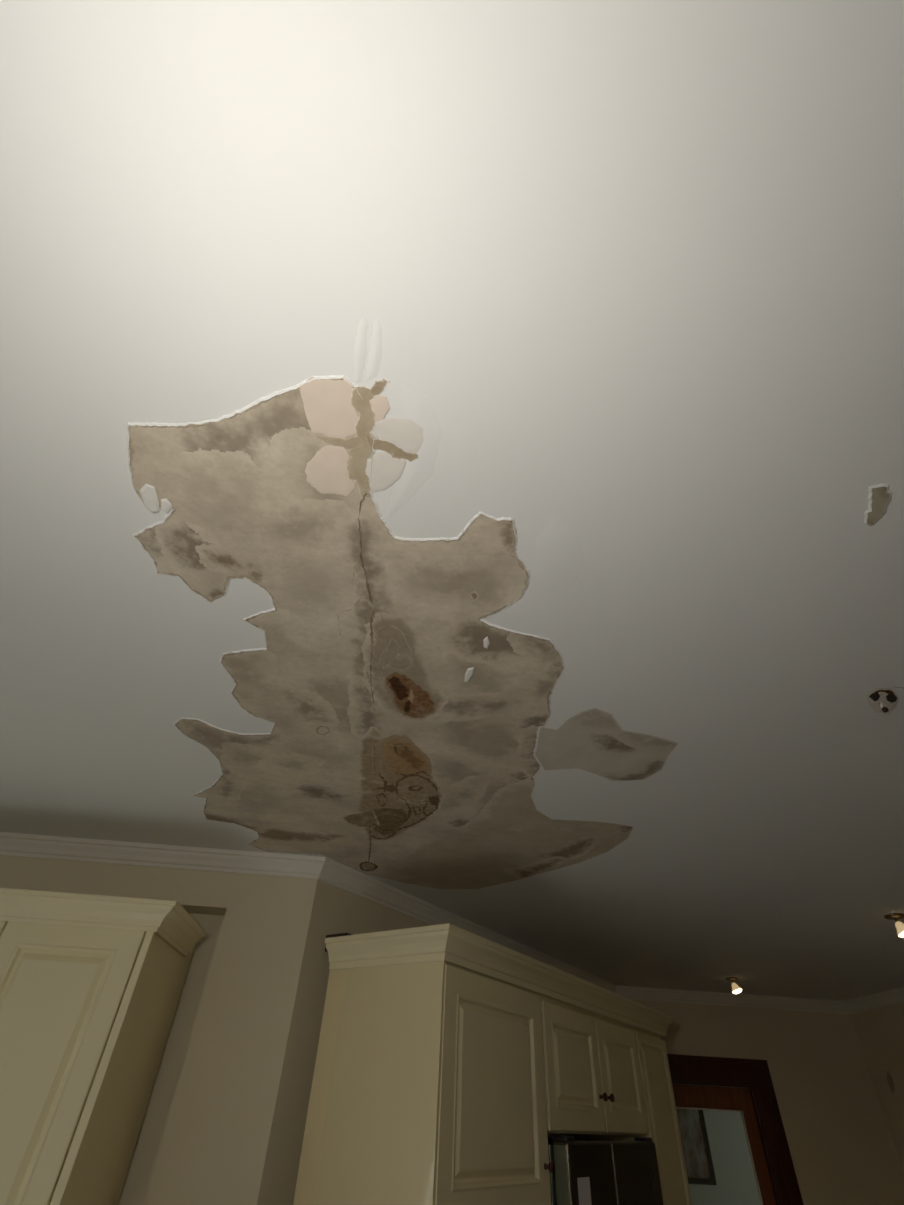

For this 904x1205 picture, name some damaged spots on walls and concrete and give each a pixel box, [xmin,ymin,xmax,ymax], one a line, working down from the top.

peeling [127,375,565,889]
crack [316,379,418,812]
corrosion [341,612,449,871]
damp [136,389,680,889]
peeling [864,483,892,526]